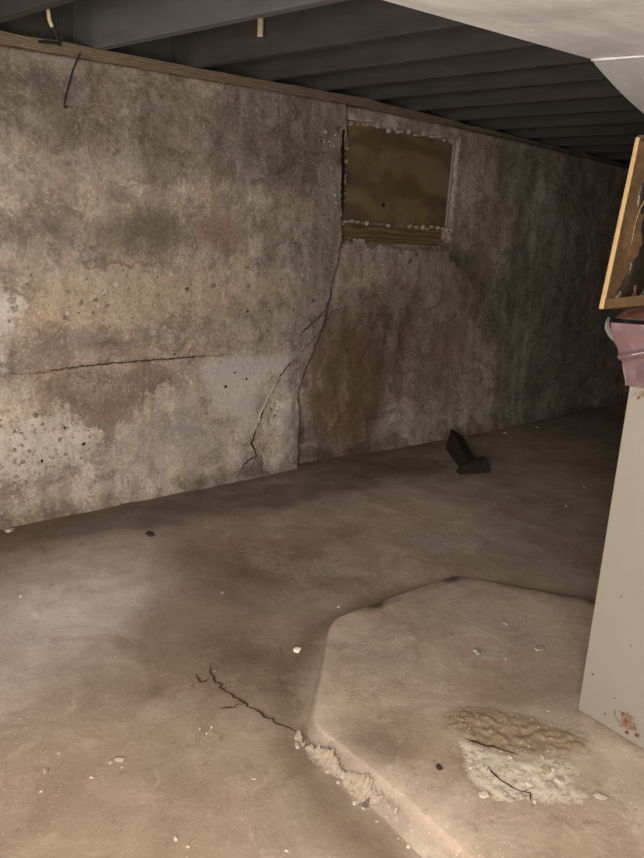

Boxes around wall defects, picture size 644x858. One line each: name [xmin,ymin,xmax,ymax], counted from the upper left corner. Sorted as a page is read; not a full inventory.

crack [5,353,241,376]
crack [241,281,333,470]
crack [196,661,313,744]
spalling [294,730,398,815]
spalling [439,707,594,807]